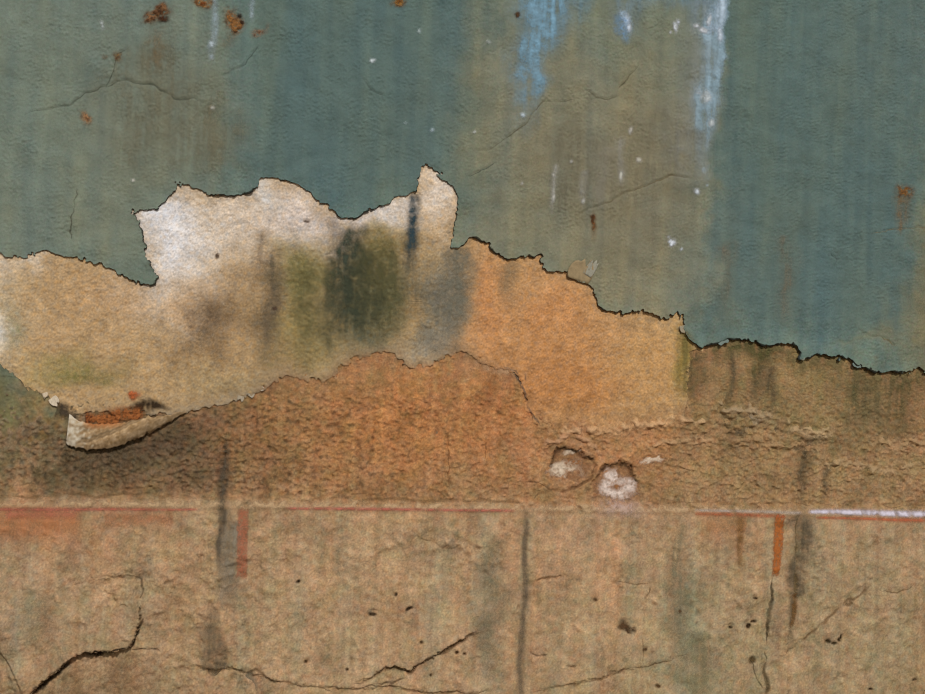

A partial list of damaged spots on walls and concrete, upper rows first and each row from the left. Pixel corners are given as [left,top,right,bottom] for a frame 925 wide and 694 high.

corrosion [144,2,170,23]
corrosion [225,11,244,33]
water stain [406,196,418,272]
water stain [325,229,396,325]
flaking render [0,164,925,694]
crack [30,622,156,694]
crack [365,634,472,687]
crack [753,576,852,693]